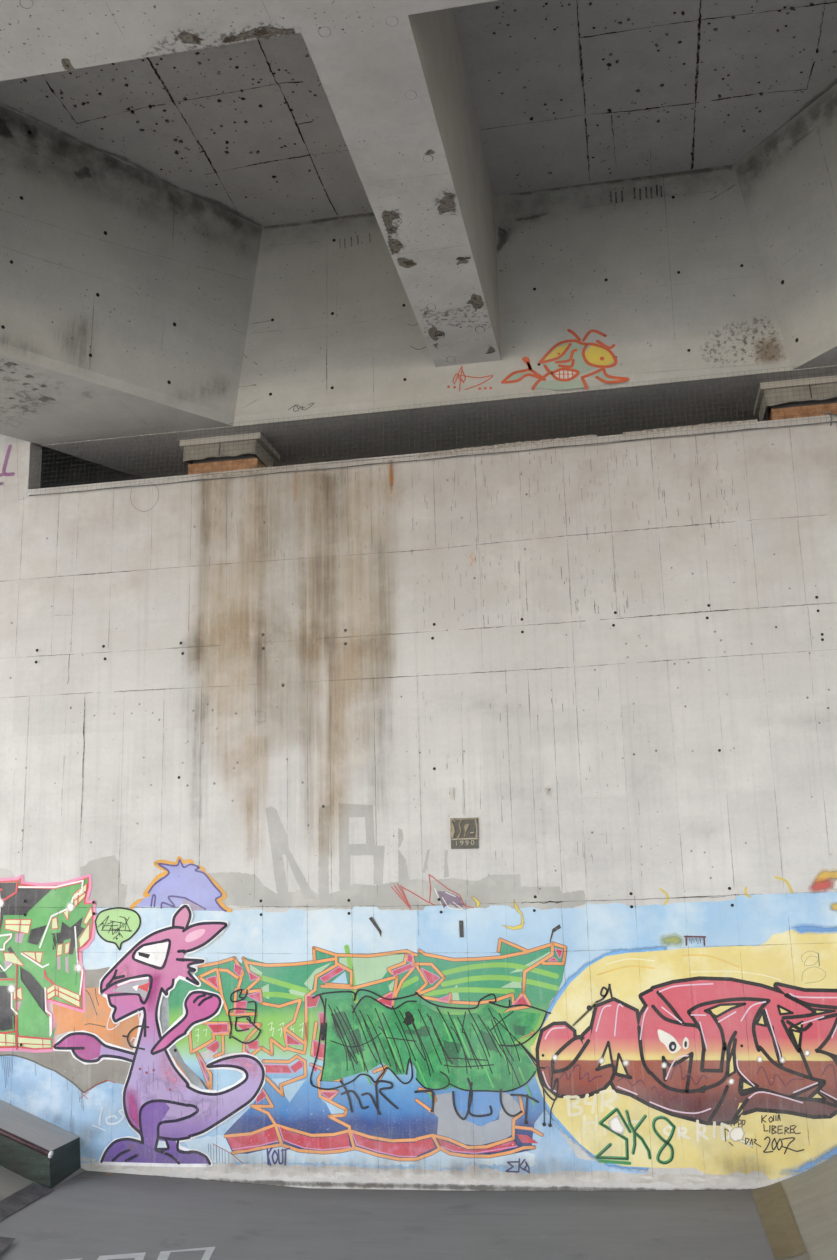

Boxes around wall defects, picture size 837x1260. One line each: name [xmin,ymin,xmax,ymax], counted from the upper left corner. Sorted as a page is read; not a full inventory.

spalling [172,31,202,45]
spalling [222,17,295,43]
spalling [418,189,456,236]
spalling [382,187,432,309]
spalling [450,294,484,311]
spalling [426,325,444,347]